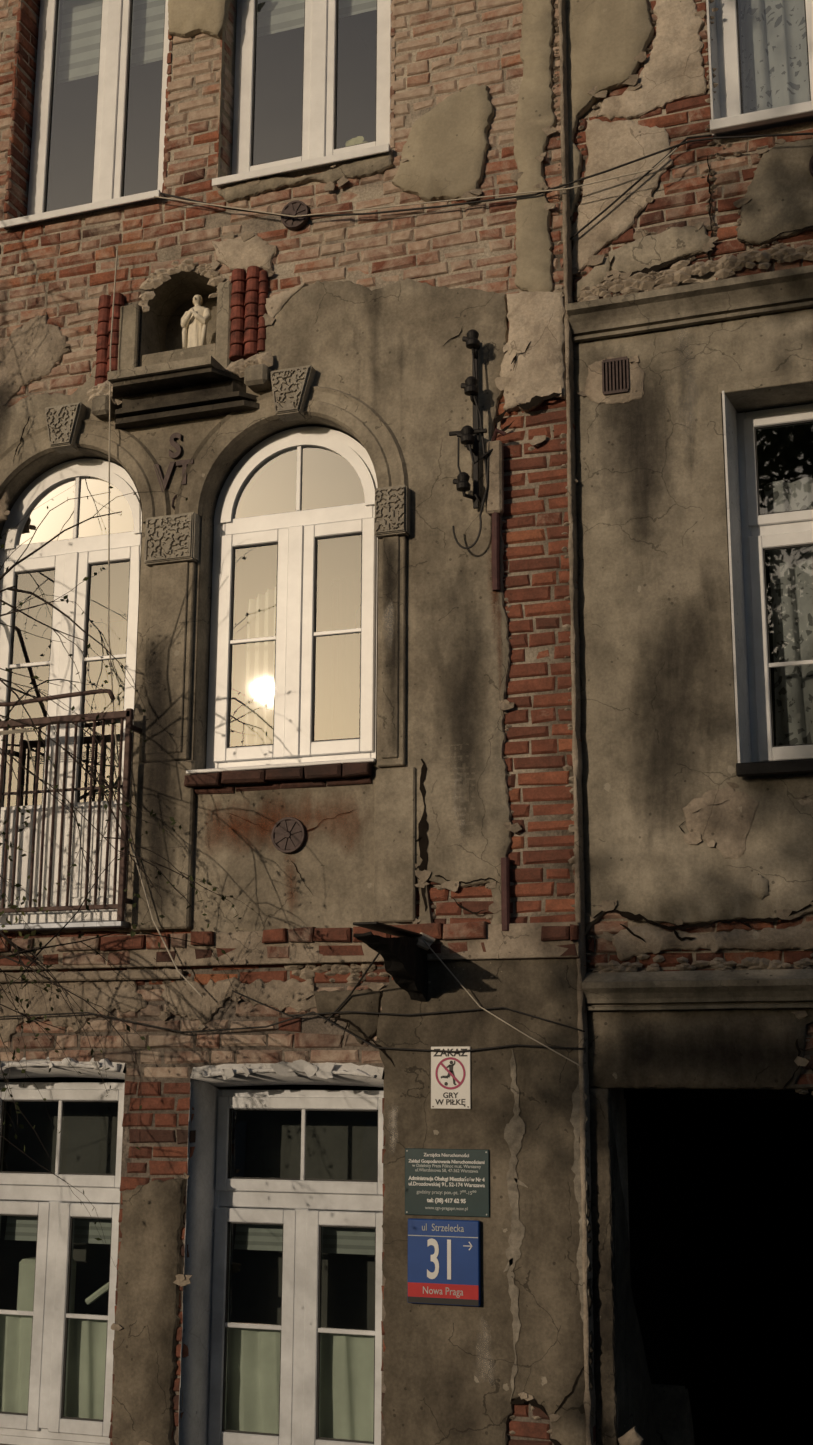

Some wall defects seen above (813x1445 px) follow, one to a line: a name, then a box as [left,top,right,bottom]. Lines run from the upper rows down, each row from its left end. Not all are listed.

peeling [218,84,495,203]
peeling [510,0,813,303]
spalling [392,430,813,974]
crack [415,759,501,914]
spalling [507,1392,561,1445]
peeling [618,1426,644,1445]